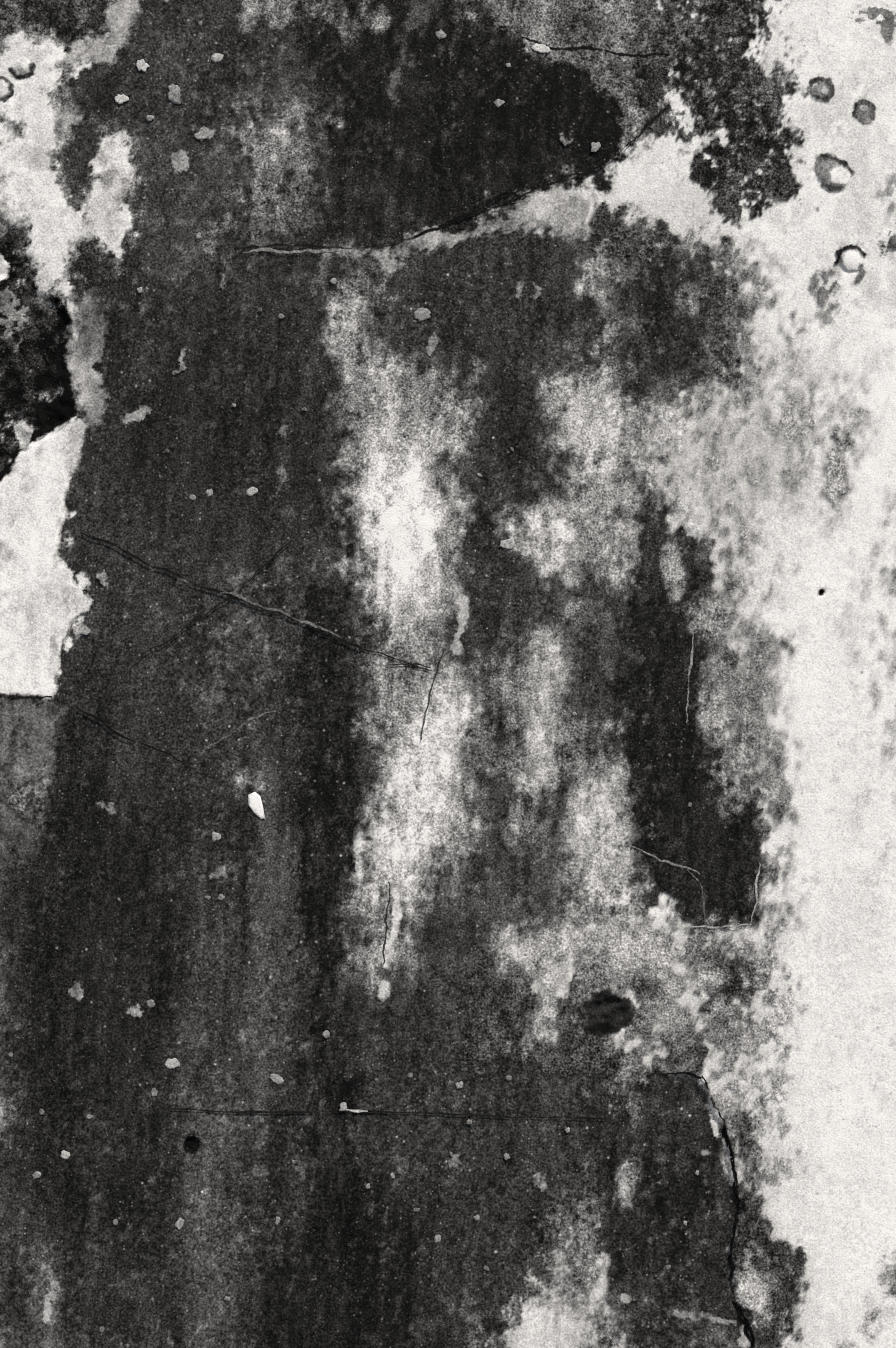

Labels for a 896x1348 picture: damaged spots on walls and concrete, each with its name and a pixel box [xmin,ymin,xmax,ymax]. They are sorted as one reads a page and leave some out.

crack [522,37,670,57]
damp [0,114,25,146]
crack [234,104,669,253]
damp [9,217,89,313]
peeling [0,0,141,865]
damp [691,428,748,505]
damp [763,380,870,529]
damp [751,696,766,725]
peeling [68,981,84,1000]
crack [663,1072,755,1348]
damp [712,1078,810,1348]
damp [586,1304,622,1348]